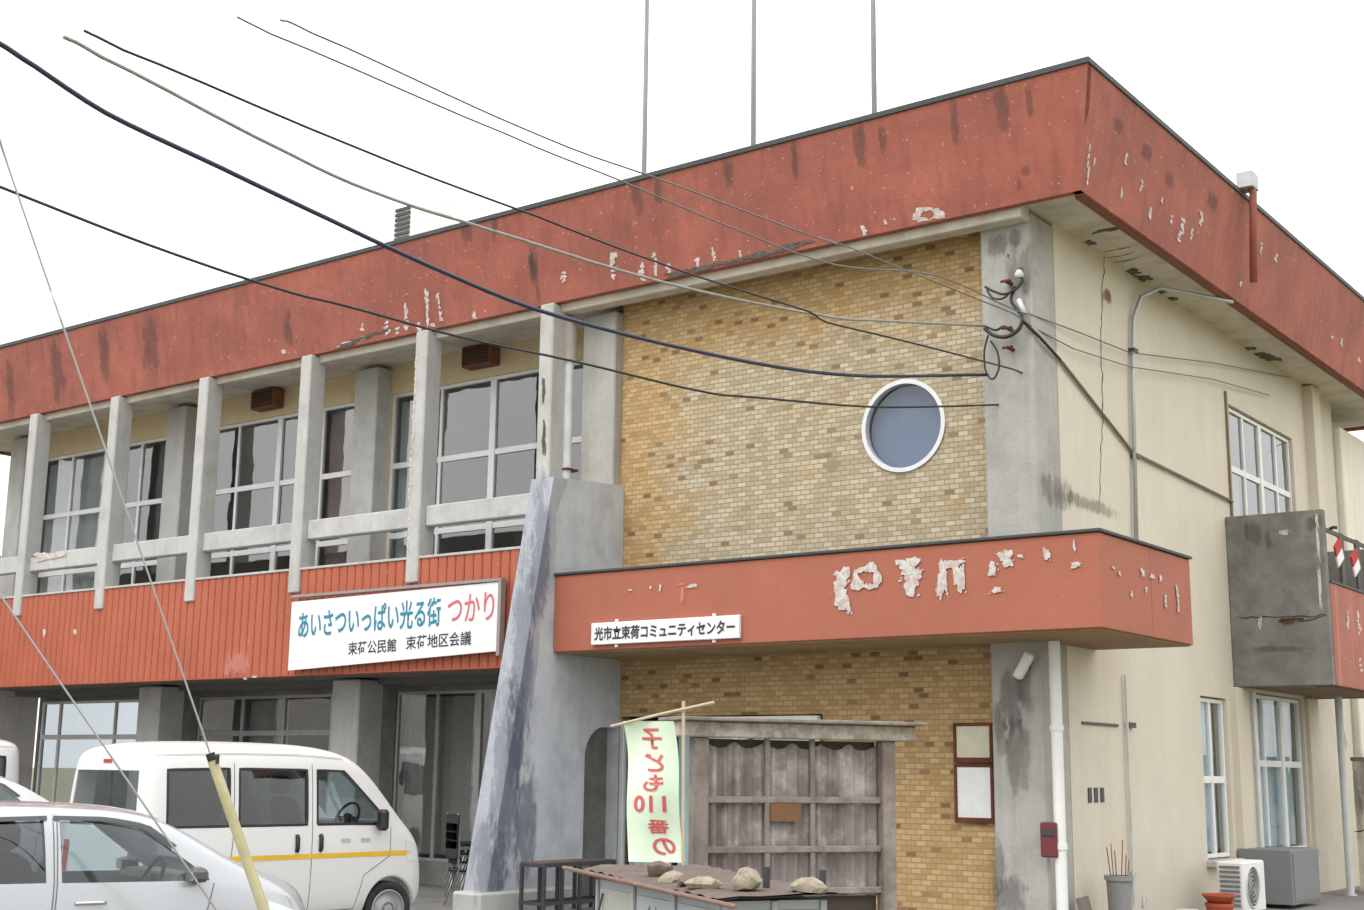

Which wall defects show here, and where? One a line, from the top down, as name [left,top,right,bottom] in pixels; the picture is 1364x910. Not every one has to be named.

peeling [912,207,945,223]
spalling [1085,227,1118,246]
peeling [1148,196,1204,242]
peeling [609,252,618,280]
peeling [336,289,444,349]
peeling [831,562,882,614]
peeling [895,557,967,601]
peeling [986,549,1023,594]